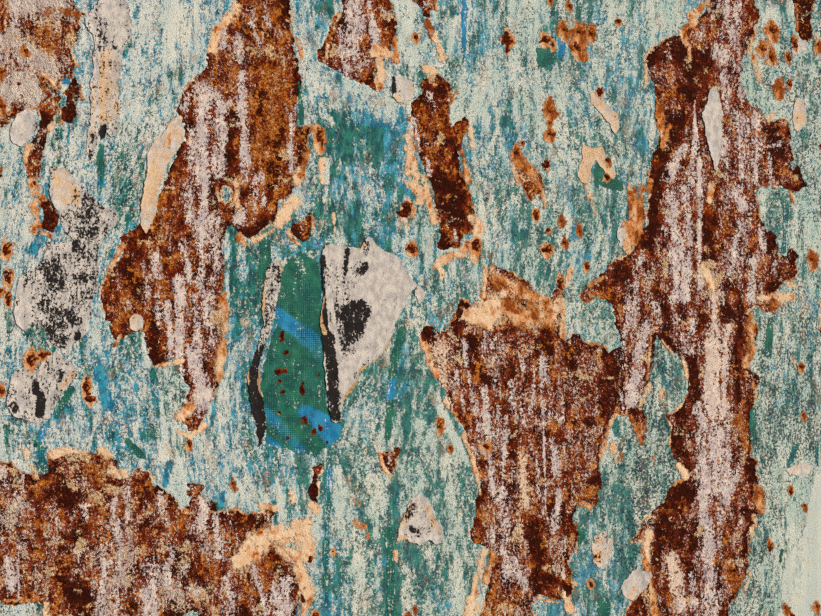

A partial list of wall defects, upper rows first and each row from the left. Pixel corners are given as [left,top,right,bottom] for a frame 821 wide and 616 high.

corrosion [0,240,15,309]
corrosion [0,0,86,238]
peeling [7,166,119,475]
peeling [85,0,132,175]
peeling [140,117,185,233]
corrosion [99,0,328,452]
corrosion [318,0,401,91]
corrosion [397,0,821,616]
peeling [702,87,724,171]
peeling [247,229,425,607]
corrosion [0,445,324,616]
peeling [384,493,444,616]